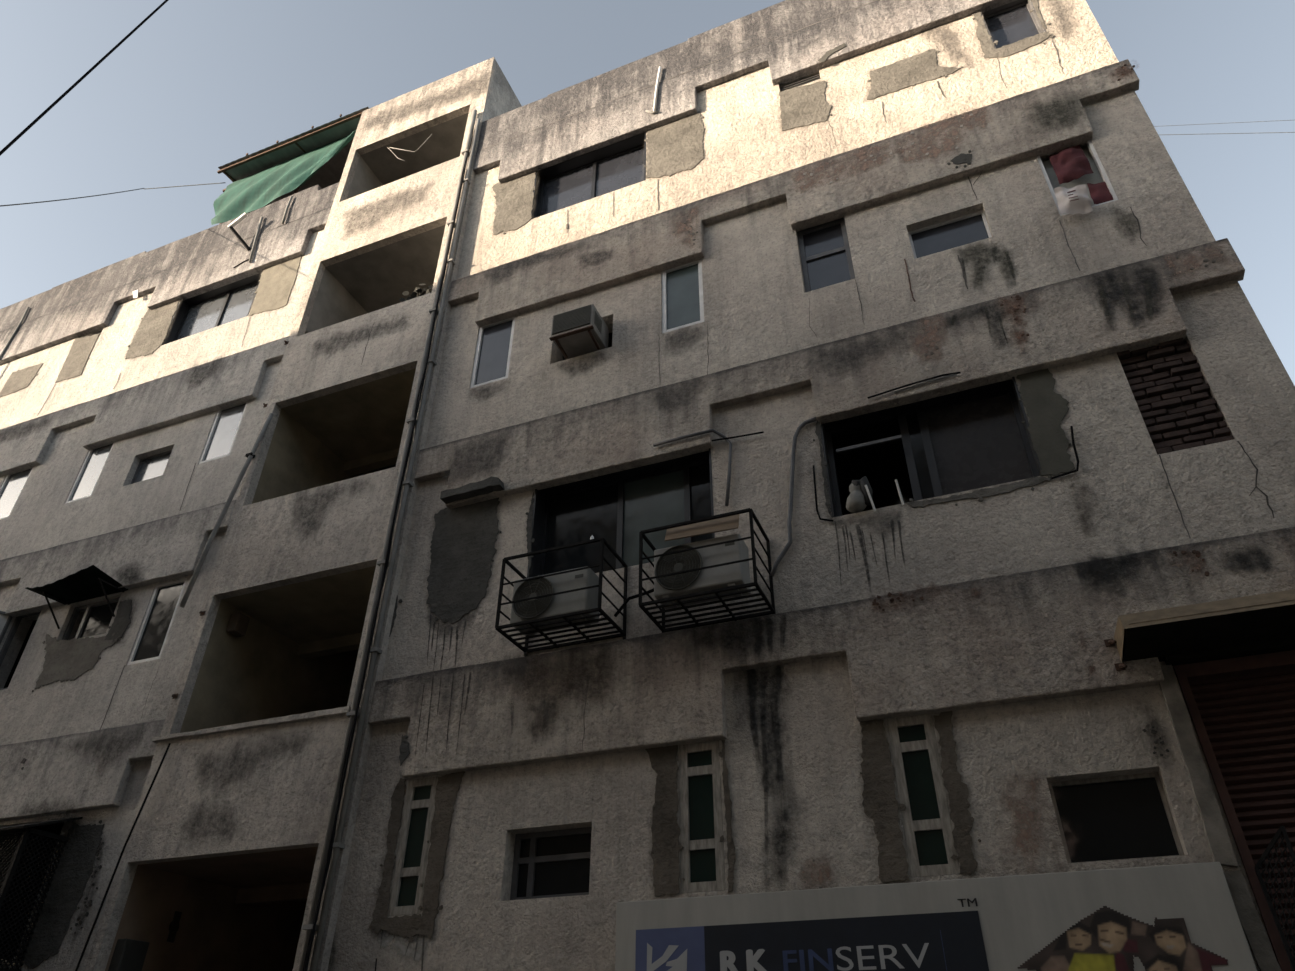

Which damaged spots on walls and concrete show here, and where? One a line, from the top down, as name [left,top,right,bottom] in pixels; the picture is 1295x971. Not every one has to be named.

water stain [835,514,905,584]
crack [1237,441,1274,518]
water stain [415,613,471,752]
water stain [700,618,791,879]